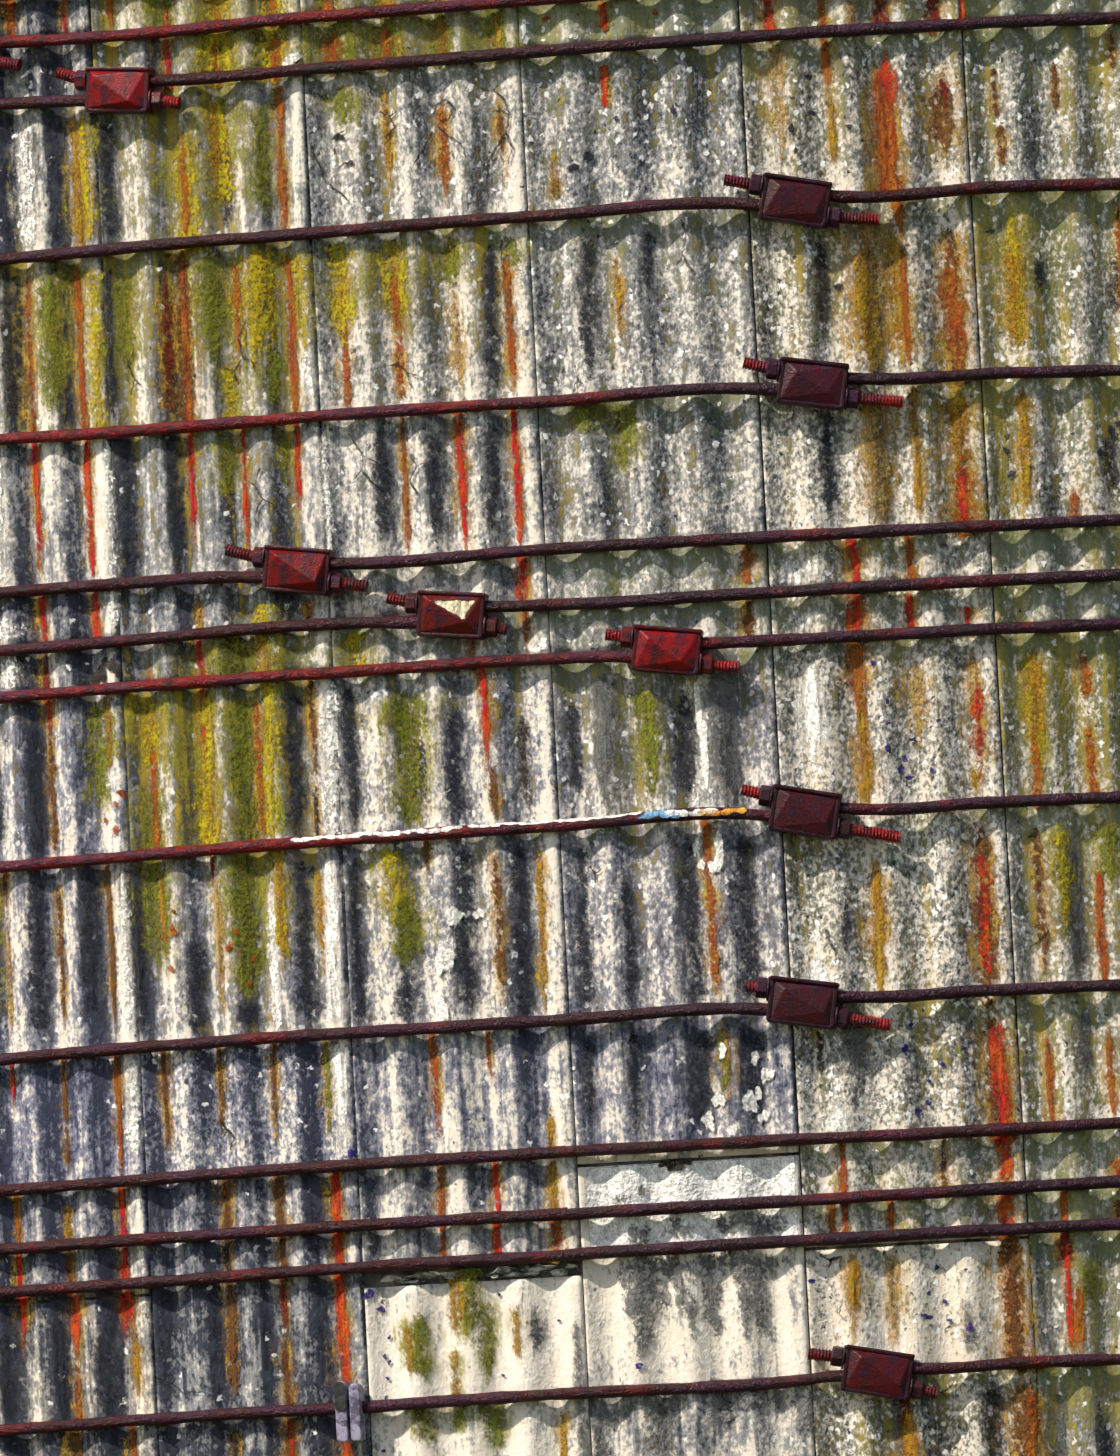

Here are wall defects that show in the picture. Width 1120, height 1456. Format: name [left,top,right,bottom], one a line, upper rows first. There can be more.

damp [0,270,25,415]
damp [102,271,116,416]
rust [268,0,303,520]
rust [832,55,985,539]
rust [32,595,59,849]
damp [131,871,148,1031]
damp [184,934,209,1031]
damp [279,693,310,833]
damp [289,862,323,1026]
rust [304,680,324,977]
rust [837,538,875,804]
rust [962,827,1049,1456]